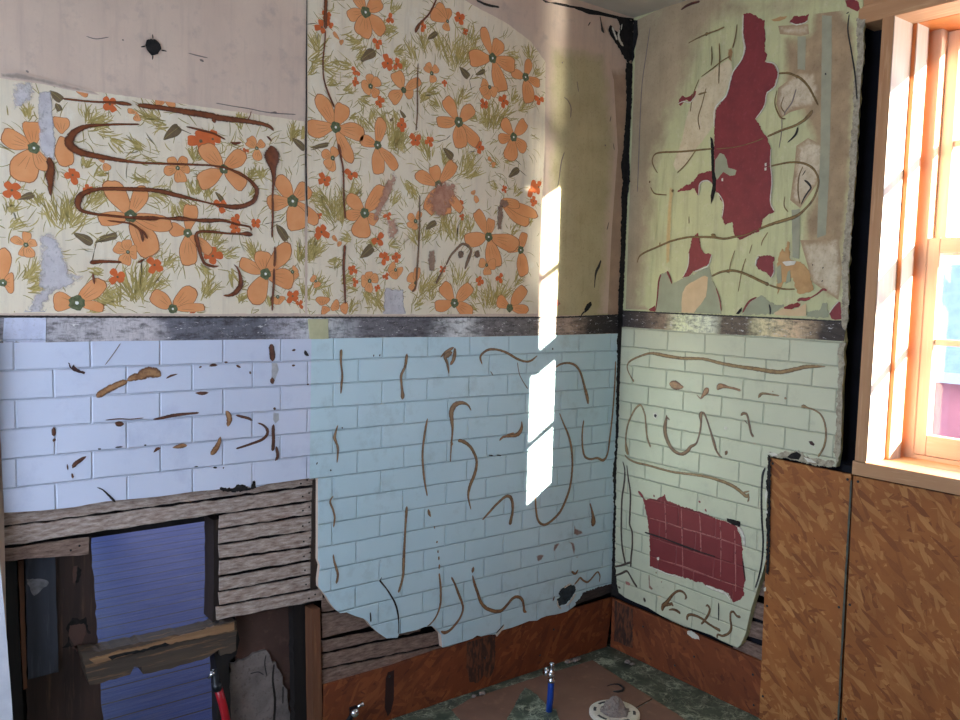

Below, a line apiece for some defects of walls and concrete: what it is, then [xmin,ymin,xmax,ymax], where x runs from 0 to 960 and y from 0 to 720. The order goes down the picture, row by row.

spalling [141,34,166,60]
peeling [608,0,866,574]
spalling [220,481,256,492]
peeling [638,491,746,602]
crack [755,468,766,588]
crack [379,577,399,634]
spalling [553,584,612,609]